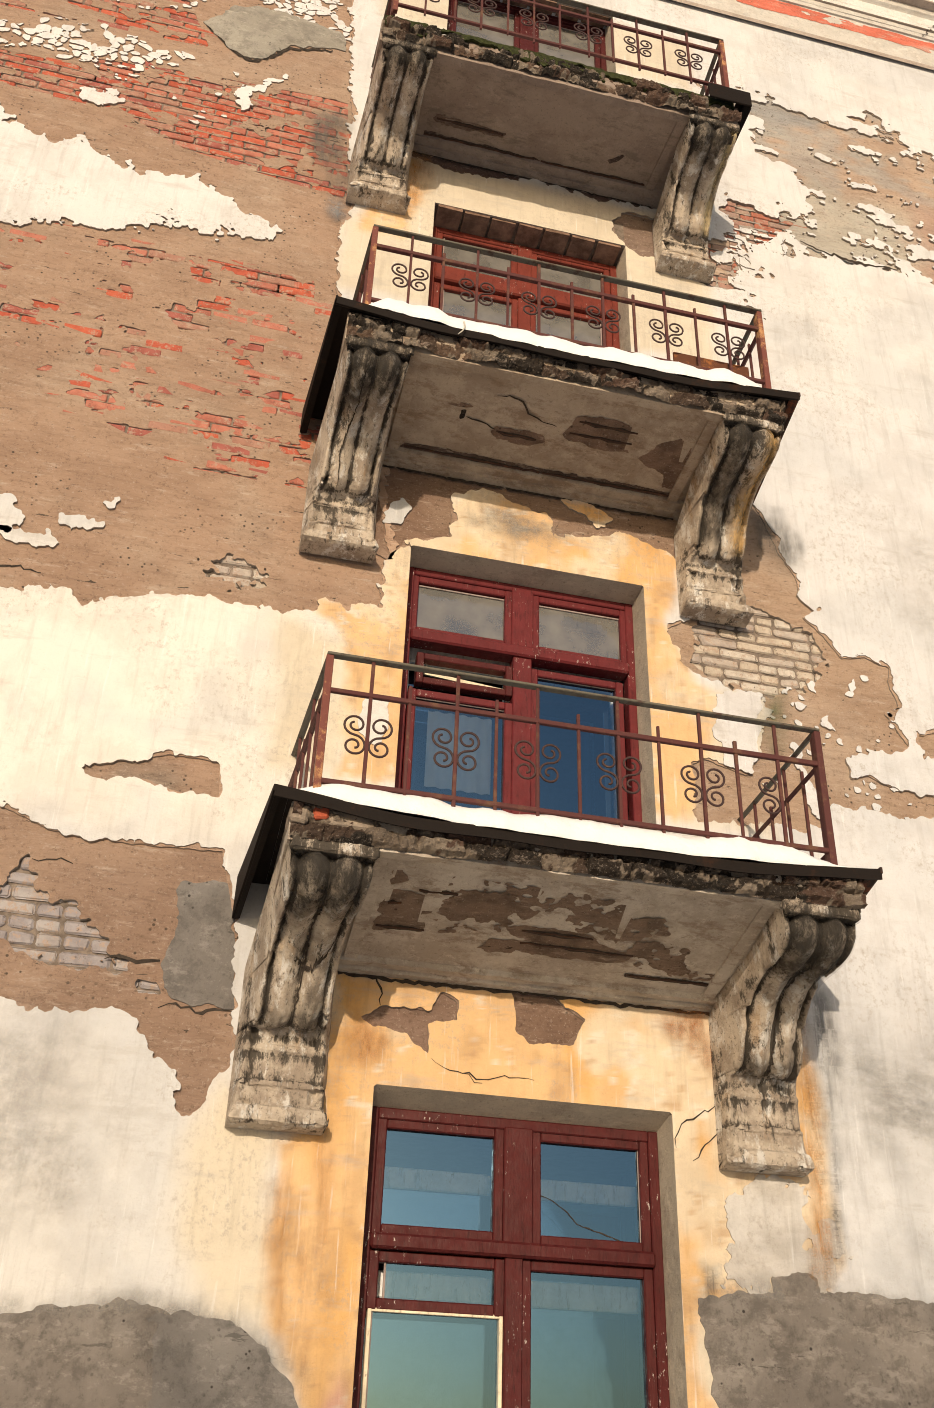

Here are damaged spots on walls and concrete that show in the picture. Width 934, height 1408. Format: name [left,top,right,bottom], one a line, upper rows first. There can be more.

peeling [381,15,934,307]
flaking render [0,0,692,614]
crack [448,395,555,430]
flaking render [667,506,934,833]
flaking render [83,750,223,797]
spalling [289,800,868,909]
flaking render [0,801,239,1116]
spalling [372,870,714,981]
flaking render [362,992,459,1053]
crack [431,1058,532,1083]
flaking render [512,993,585,1046]
crack [675,1106,717,1161]